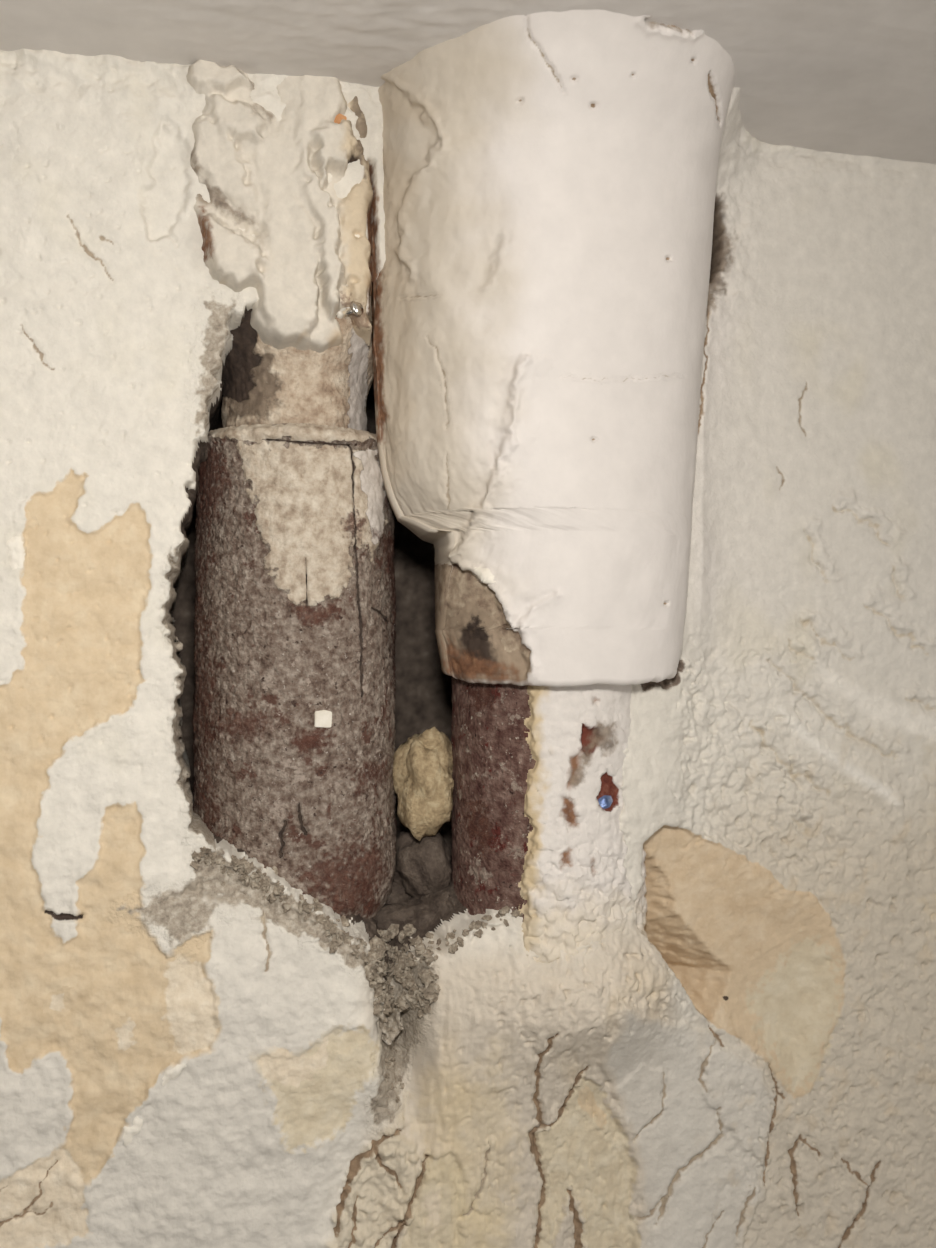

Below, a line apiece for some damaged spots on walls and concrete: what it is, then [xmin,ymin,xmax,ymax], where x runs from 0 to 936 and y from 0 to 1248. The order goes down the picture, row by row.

spalling [180,286,250,446]
rust [192,442,267,837]
rust [341,511,396,694]
peeling [434,558,541,686]
peeling [0,457,442,1248]
rust [297,837,386,918]
rust [550,688,624,882]
spalling [631,820,864,1119]
crack [330,1126,433,1248]
crack [525,1031,592,1248]
crack [630,1013,730,1231]
crack [700,1058,885,1248]